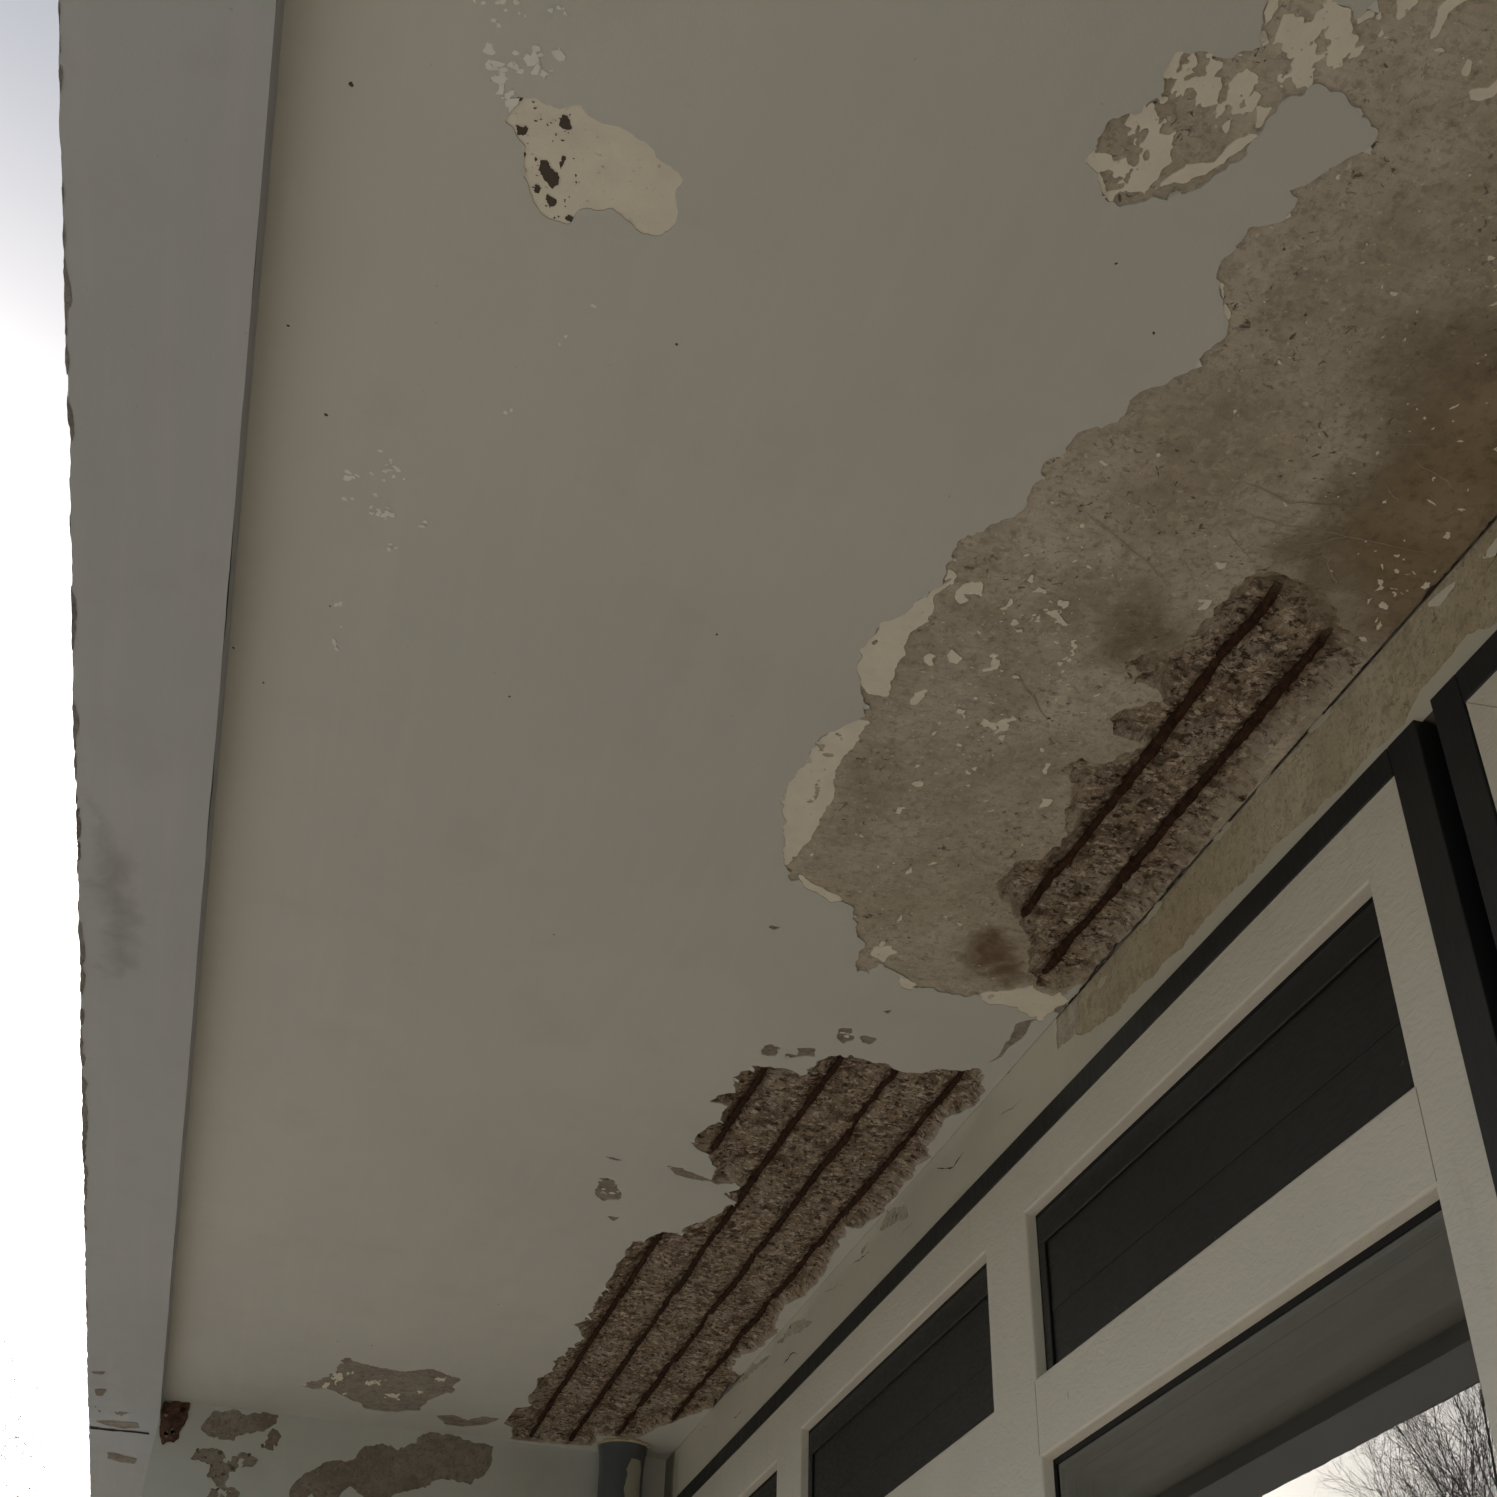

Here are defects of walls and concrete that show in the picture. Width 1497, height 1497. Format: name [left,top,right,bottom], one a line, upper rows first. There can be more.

peeling [504,0,1497,1445]
peeling [302,1358,461,1412]
peeling [159,1401,281,1497]
peeling [289,1432,493,1497]